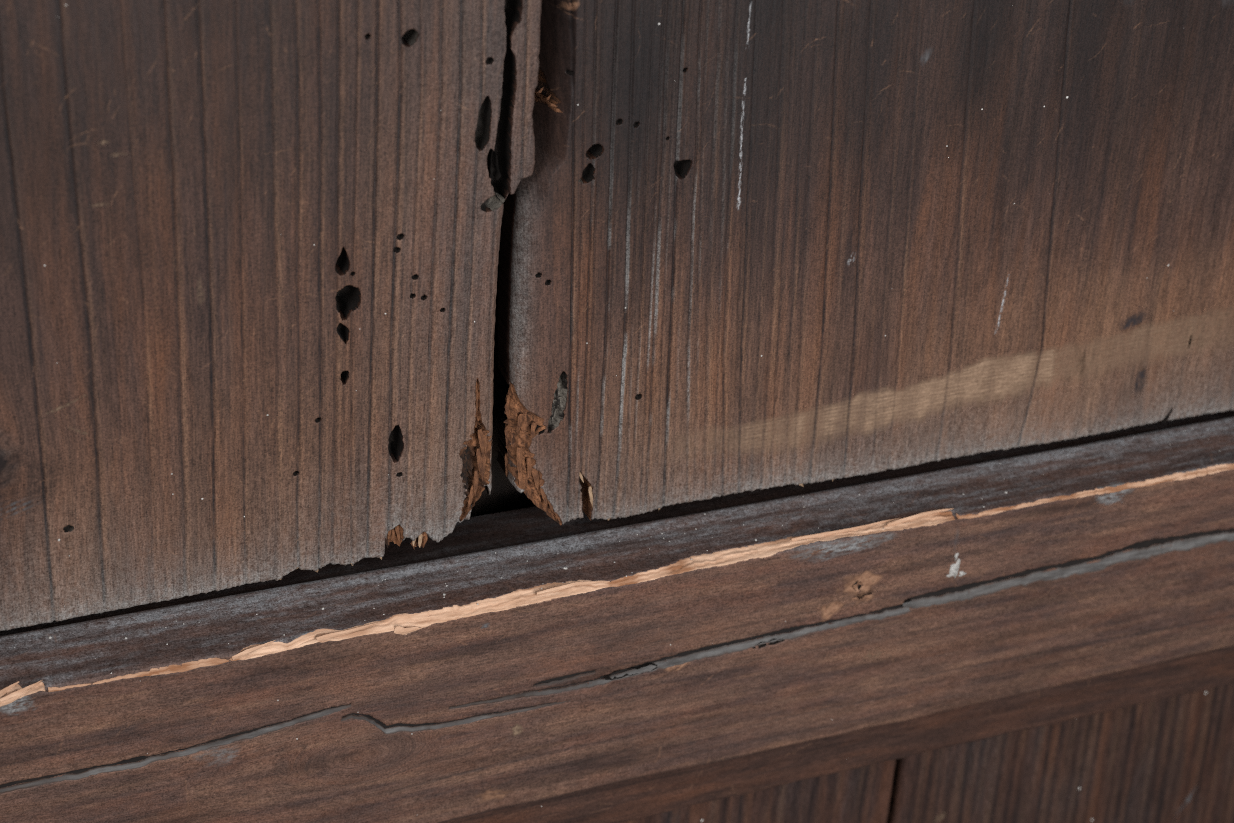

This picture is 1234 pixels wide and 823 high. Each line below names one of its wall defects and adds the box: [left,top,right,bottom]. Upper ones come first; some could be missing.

peeling [385,525,428,548]
peeling [468,429,487,509]
spalling [505,371,568,521]
crack [0,529,1234,794]